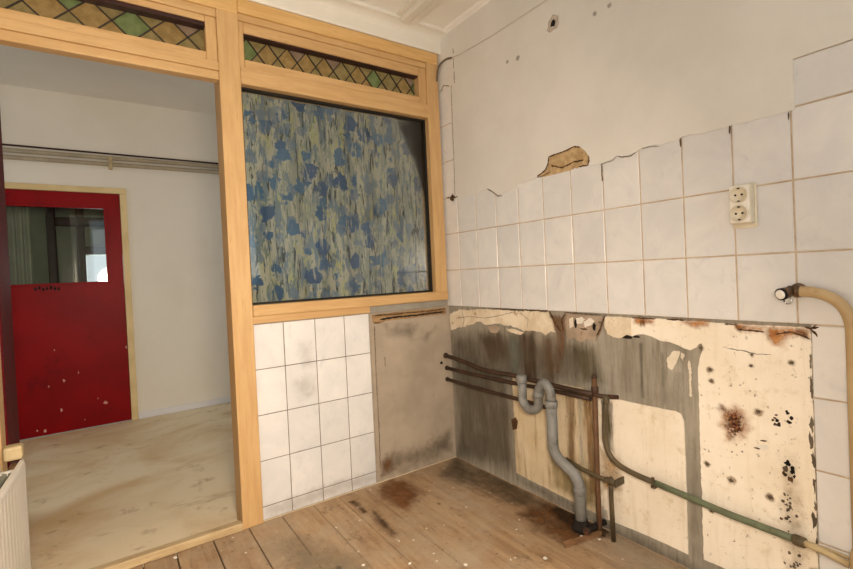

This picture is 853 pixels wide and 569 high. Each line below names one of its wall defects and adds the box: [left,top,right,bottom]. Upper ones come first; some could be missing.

flaking render [537,146,590,178]
peeling [372,308,640,342]
corrosion [725,323,811,344]
corrosion [722,407,744,437]
leakage [445,335,609,542]
peeling [782,460,796,483]
leakage [380,481,416,507]
peeling [766,493,798,532]